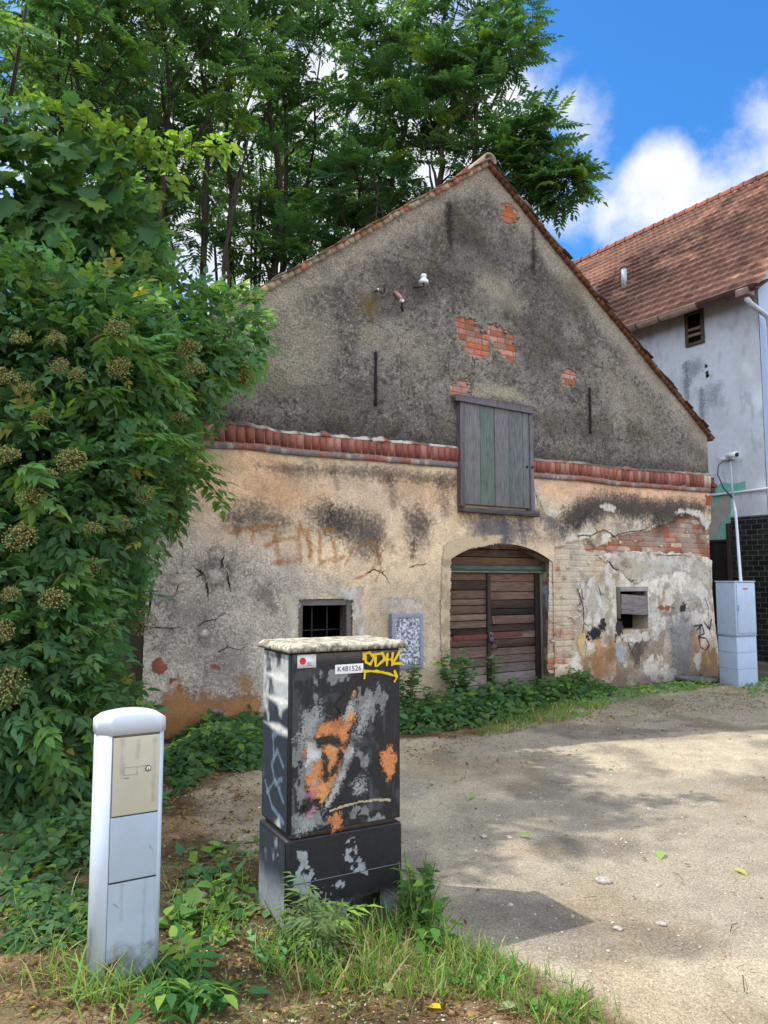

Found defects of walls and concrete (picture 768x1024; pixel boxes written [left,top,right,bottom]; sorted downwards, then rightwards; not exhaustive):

flaking render [501,204,520,224]
flaking render [455,316,515,363]
flaking render [450,379,471,396]
flaking render [562,369,576,387]
leakage [320,504,386,555]
leakage [406,510,430,541]
leakage [467,493,712,545]
crack [535,495,650,661]
flaking render [547,481,746,674]
crack [147,555,243,653]
flaking render [152,657,176,684]